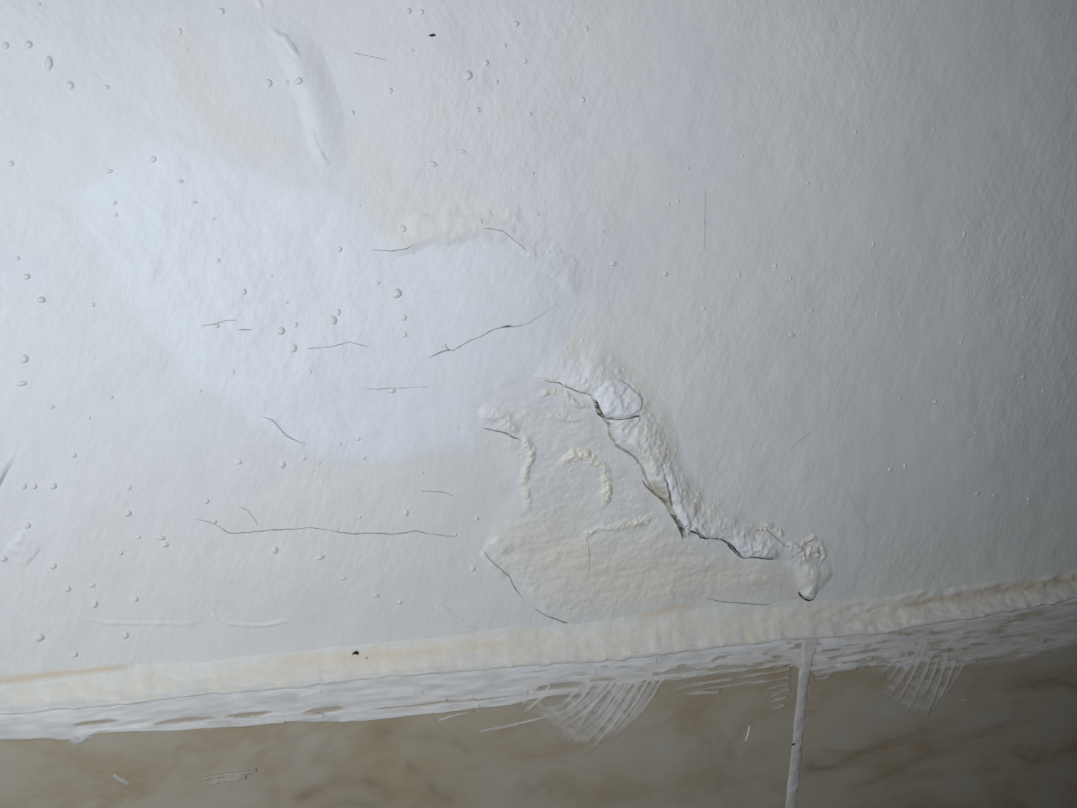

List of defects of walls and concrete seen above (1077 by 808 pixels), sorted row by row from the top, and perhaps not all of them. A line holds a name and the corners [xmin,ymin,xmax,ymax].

crack [553,382,788,560]